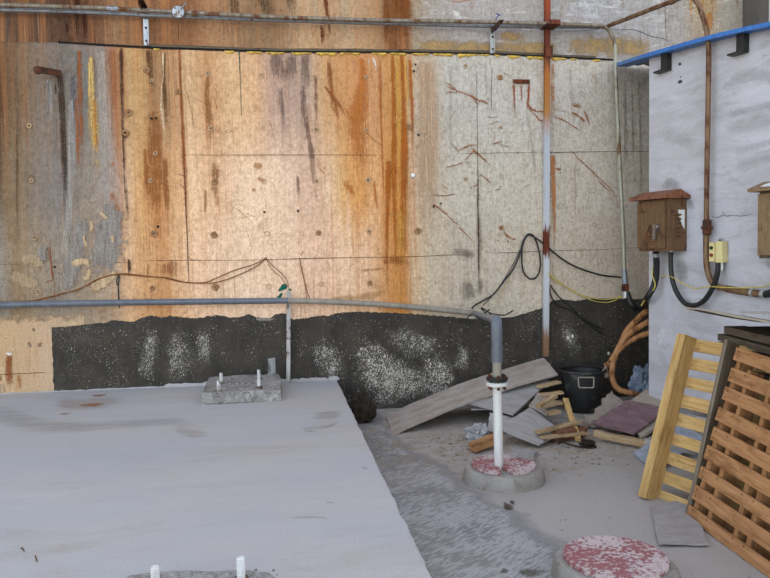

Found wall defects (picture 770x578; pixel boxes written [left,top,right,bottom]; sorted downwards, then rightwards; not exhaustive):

corrosion [144,111,169,211]
corrosion [178,49,187,204]
corrosion [324,58,367,159]
corrosion [374,56,414,275]